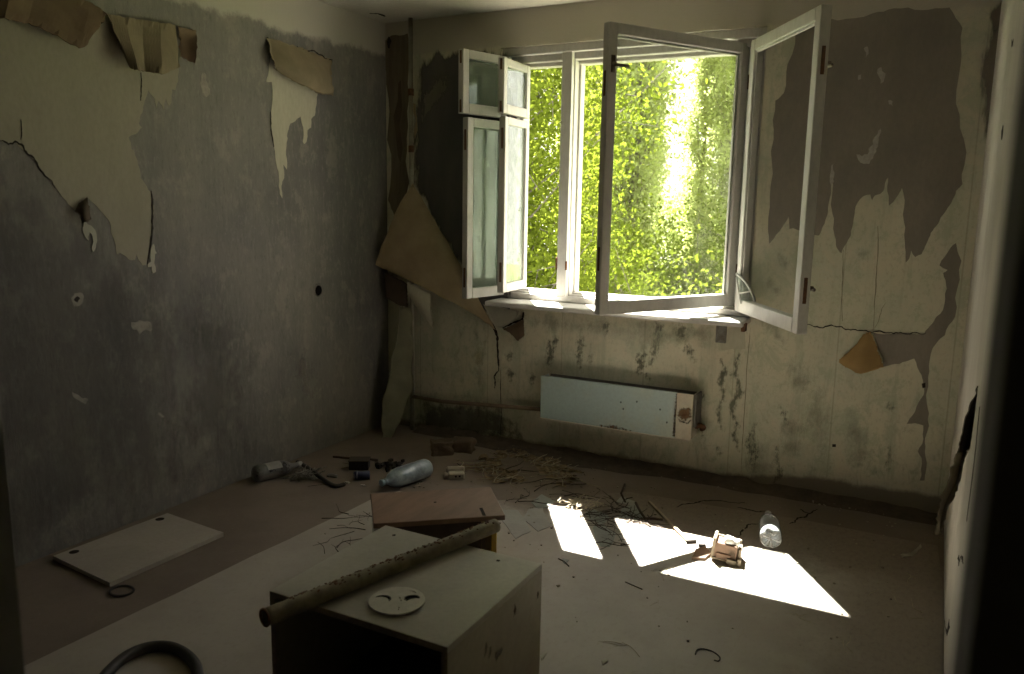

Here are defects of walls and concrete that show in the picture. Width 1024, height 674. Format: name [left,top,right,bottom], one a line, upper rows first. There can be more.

peeling [0,15,179,265]
peeling [266,58,318,197]
flaking render [768,26,815,243]
flaking render [814,8,966,262]
crack [493,324,502,436]
leakage [717,354,759,460]
crack [807,226,925,335]
flaking render [873,243,961,481]